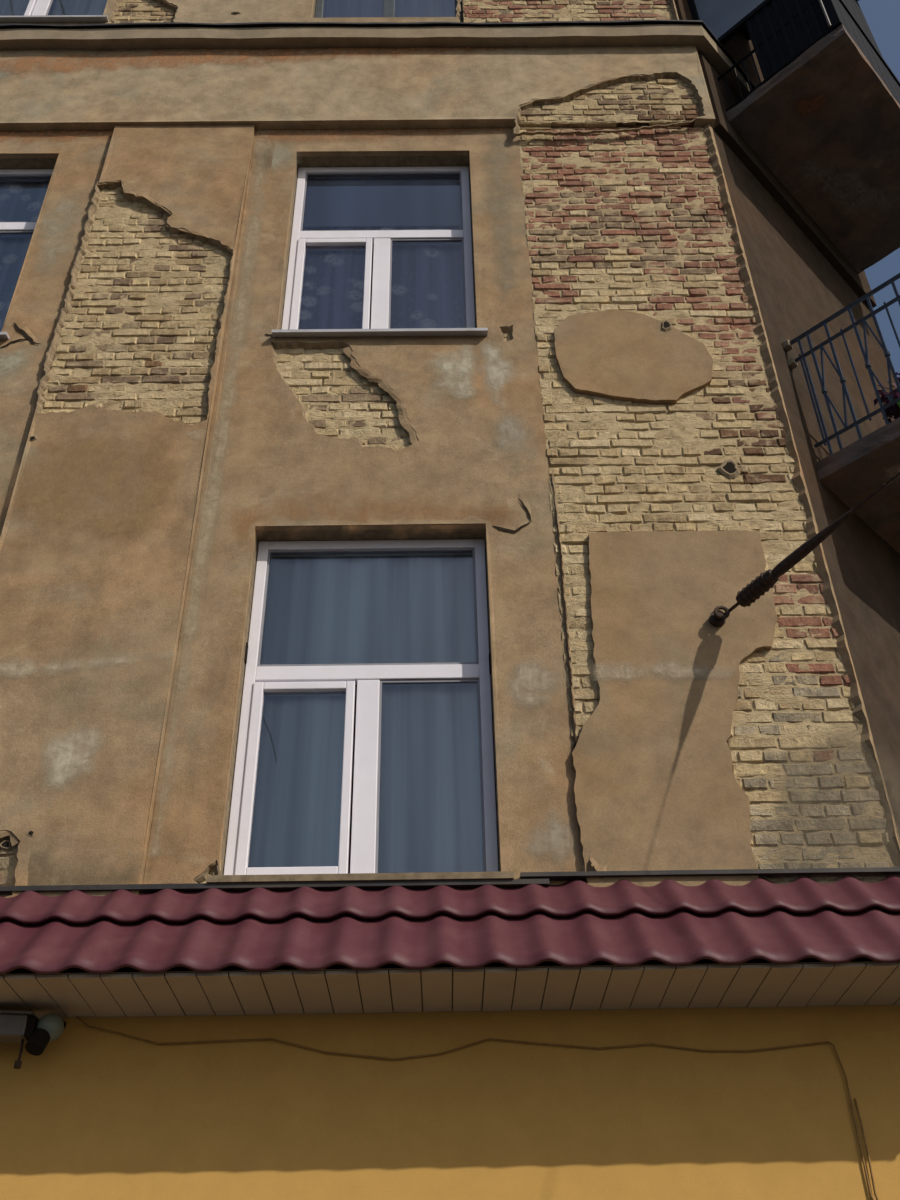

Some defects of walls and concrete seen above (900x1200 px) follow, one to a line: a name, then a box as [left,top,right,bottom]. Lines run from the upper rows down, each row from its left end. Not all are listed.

flaking render [109,0,178,23]
flaking render [455,0,677,23]
flaking render [36,180,237,425]
flaking render [500,326,513,342]
flaking render [271,342,419,451]
flaking render [513,73,895,882]
crack [493,473,577,748]
flaking render [0,830,35,897]